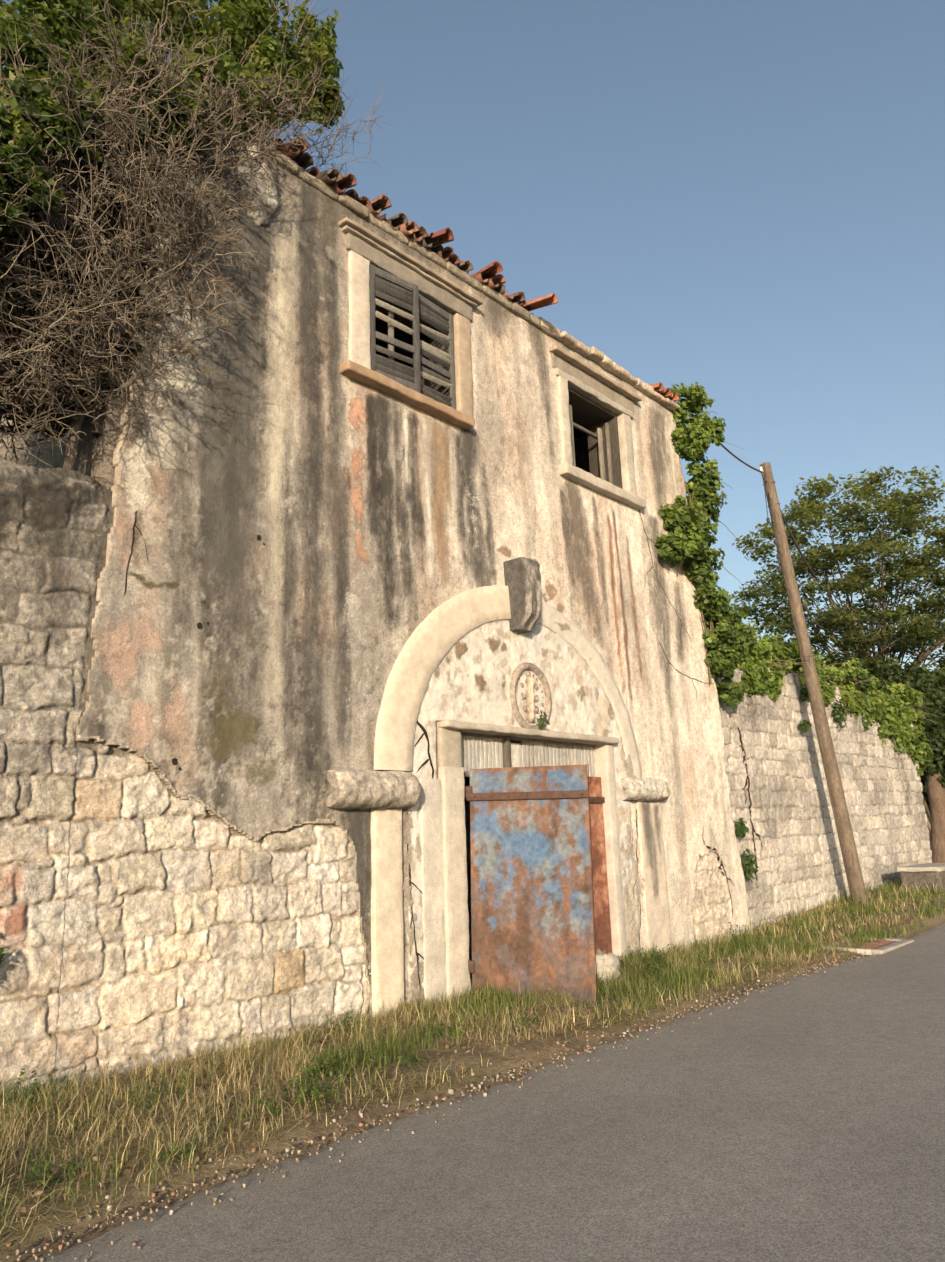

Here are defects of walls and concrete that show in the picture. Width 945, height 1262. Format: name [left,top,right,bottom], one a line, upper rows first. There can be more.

water stain [173,138,350,781]
peeling [345,449,368,563]
peeling [349,398,366,429]
water stain [365,395,433,623]
water stain [457,429,496,587]
water stain [560,481,606,640]
rust [608,512,641,698]
water stain [649,412,684,695]
spalling [683,845,740,947]